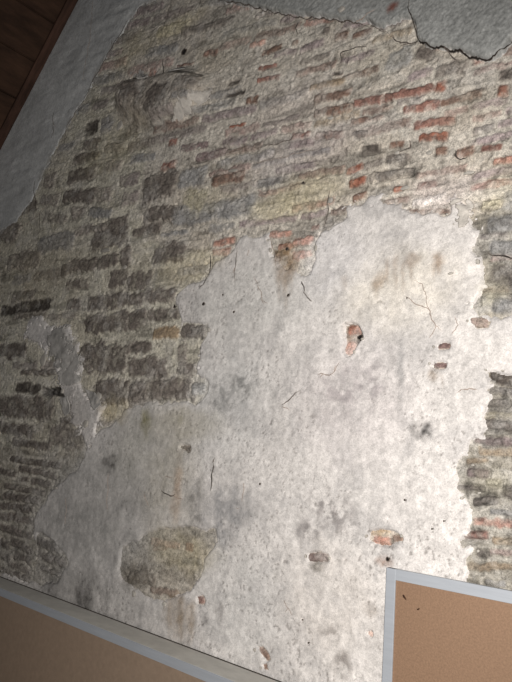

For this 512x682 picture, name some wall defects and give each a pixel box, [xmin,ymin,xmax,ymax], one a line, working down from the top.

crack [218,0,512,62]
flaking render [115,0,512,329]
flaking render [0,19,224,586]
flaking render [345,324,365,356]
crack [406,280,458,338]
flaking render [456,369,512,590]
flaking render [120,526,218,607]
flaking render [304,551,331,562]
flaking render [365,529,403,546]